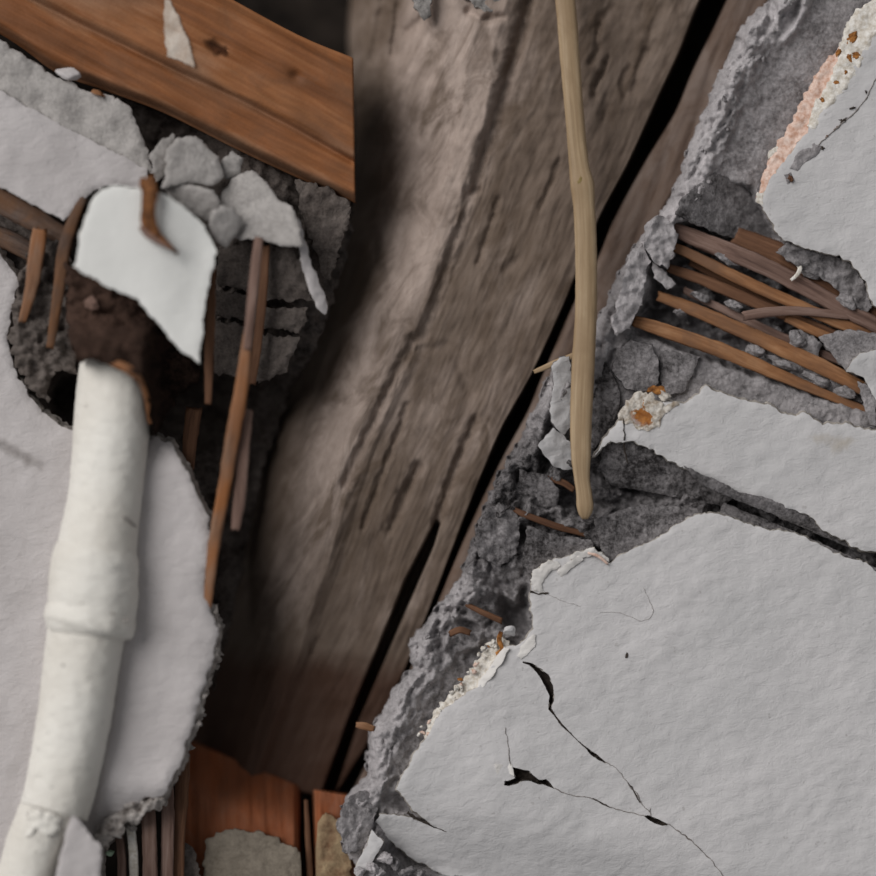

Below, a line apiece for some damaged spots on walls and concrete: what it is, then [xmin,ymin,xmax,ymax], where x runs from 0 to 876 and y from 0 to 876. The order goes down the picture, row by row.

rust [833,31,861,84]
crack [818,79,876,150]
flaking render [6,98,354,751]
flaking render [336,0,876,876]
rust [618,385,680,431]
crack [504,661,723,876]